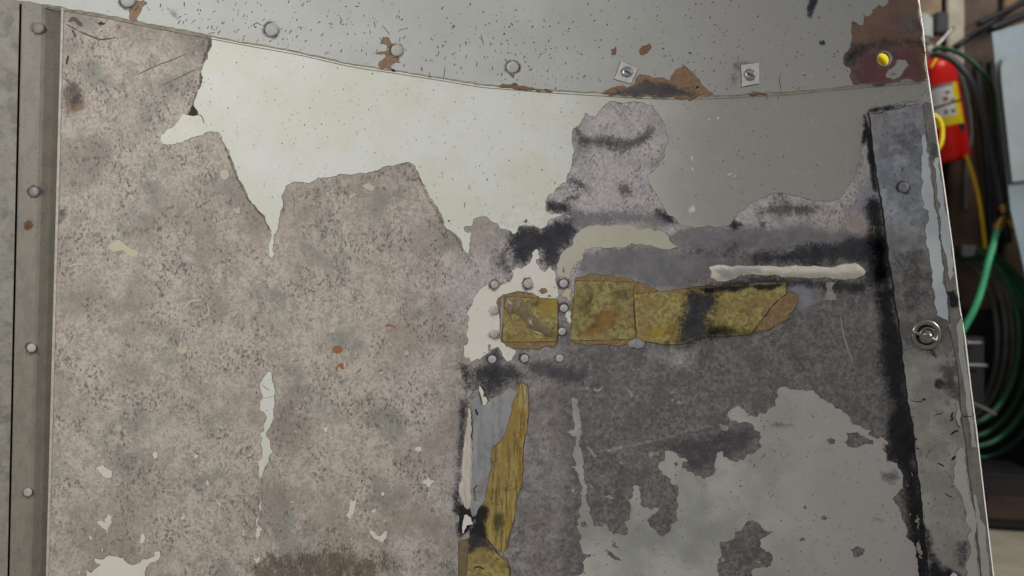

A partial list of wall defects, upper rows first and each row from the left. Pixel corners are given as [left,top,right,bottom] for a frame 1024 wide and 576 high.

rust [843,0,926,86]
peeling [161,37,928,258]
leakage [862,104,906,191]
peeling [463,224,679,362]
peeling [258,371,276,478]
peeling [89,510,112,540]
peeling [96,462,113,479]
peeling [77,548,161,576]
peeling [566,387,923,576]